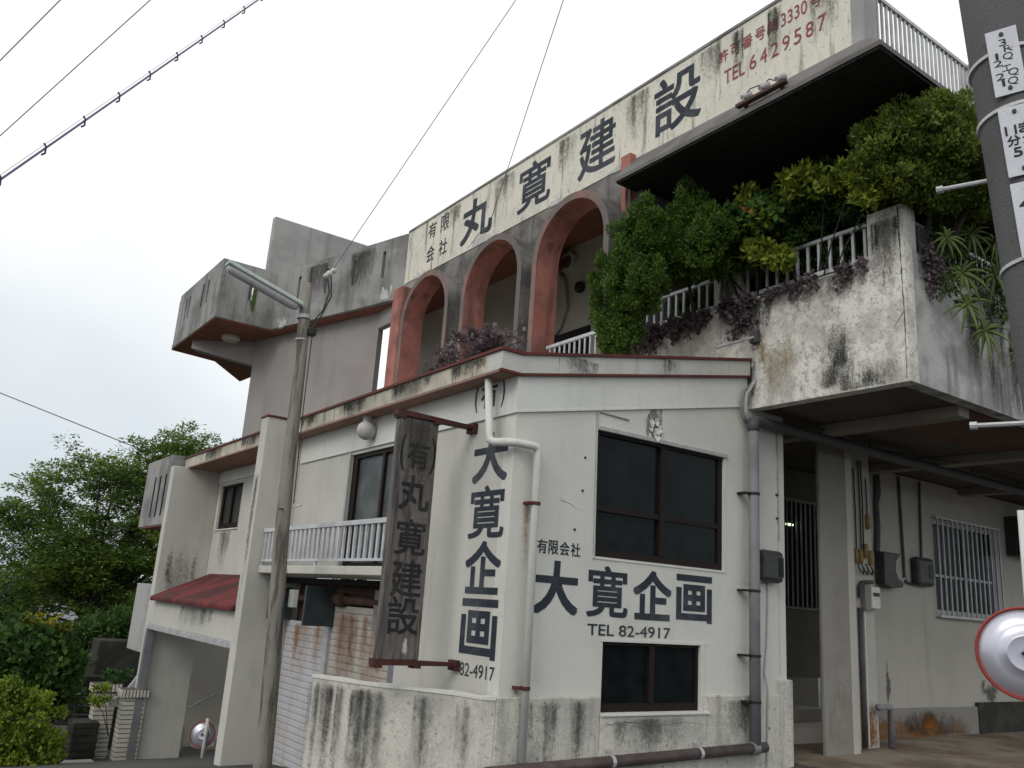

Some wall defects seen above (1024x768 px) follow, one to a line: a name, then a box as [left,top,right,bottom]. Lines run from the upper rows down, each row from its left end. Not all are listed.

water stain [310,263,327,290]
water stain [820,339,889,390]
water stain [308,685,382,766]